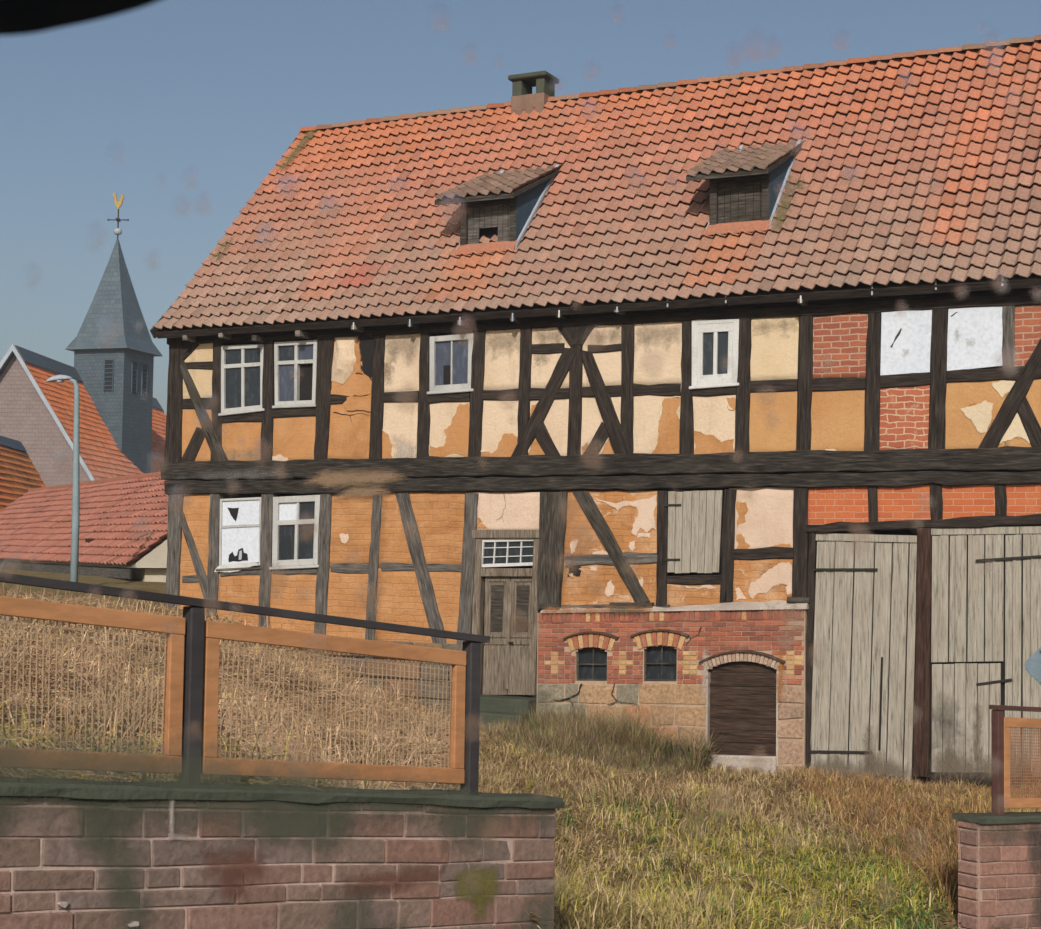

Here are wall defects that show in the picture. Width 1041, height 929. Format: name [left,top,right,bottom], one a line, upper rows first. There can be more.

spalling [358,336,374,380]
flaking render [382,430,395,458]
flaking render [429,403,470,457]
flaking render [481,433,545,457]
flaking render [652,396,681,454]
flaking render [694,429,735,454]
peeling [961,380,1016,433]
peeling [999,413,1030,445]
peeling [593,495,657,552]
flaking render [736,500,750,549]
spalling [567,539,609,578]
peeling [734,562,792,600]